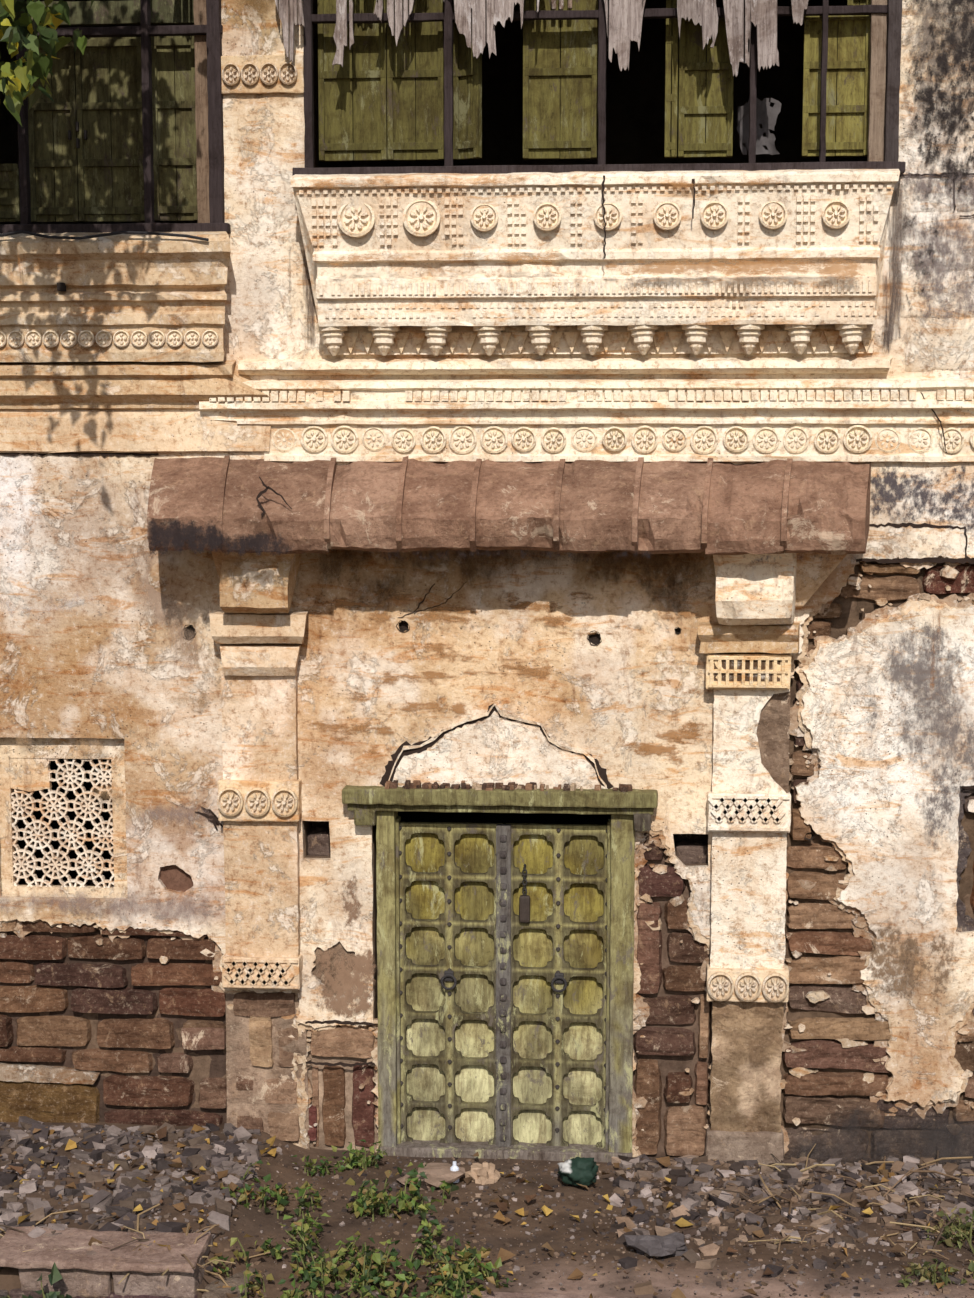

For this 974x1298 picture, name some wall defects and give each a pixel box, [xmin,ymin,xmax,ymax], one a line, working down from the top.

damp [884,0,974,352]
crack [256,477,292,518]
damp [871,463,974,534]
damp [883,626,974,845]
flaking render [160,865,193,892]
flaking render [0,919,378,1152]
flaking render [632,829,712,1157]
flaking render [756,556,974,1163]